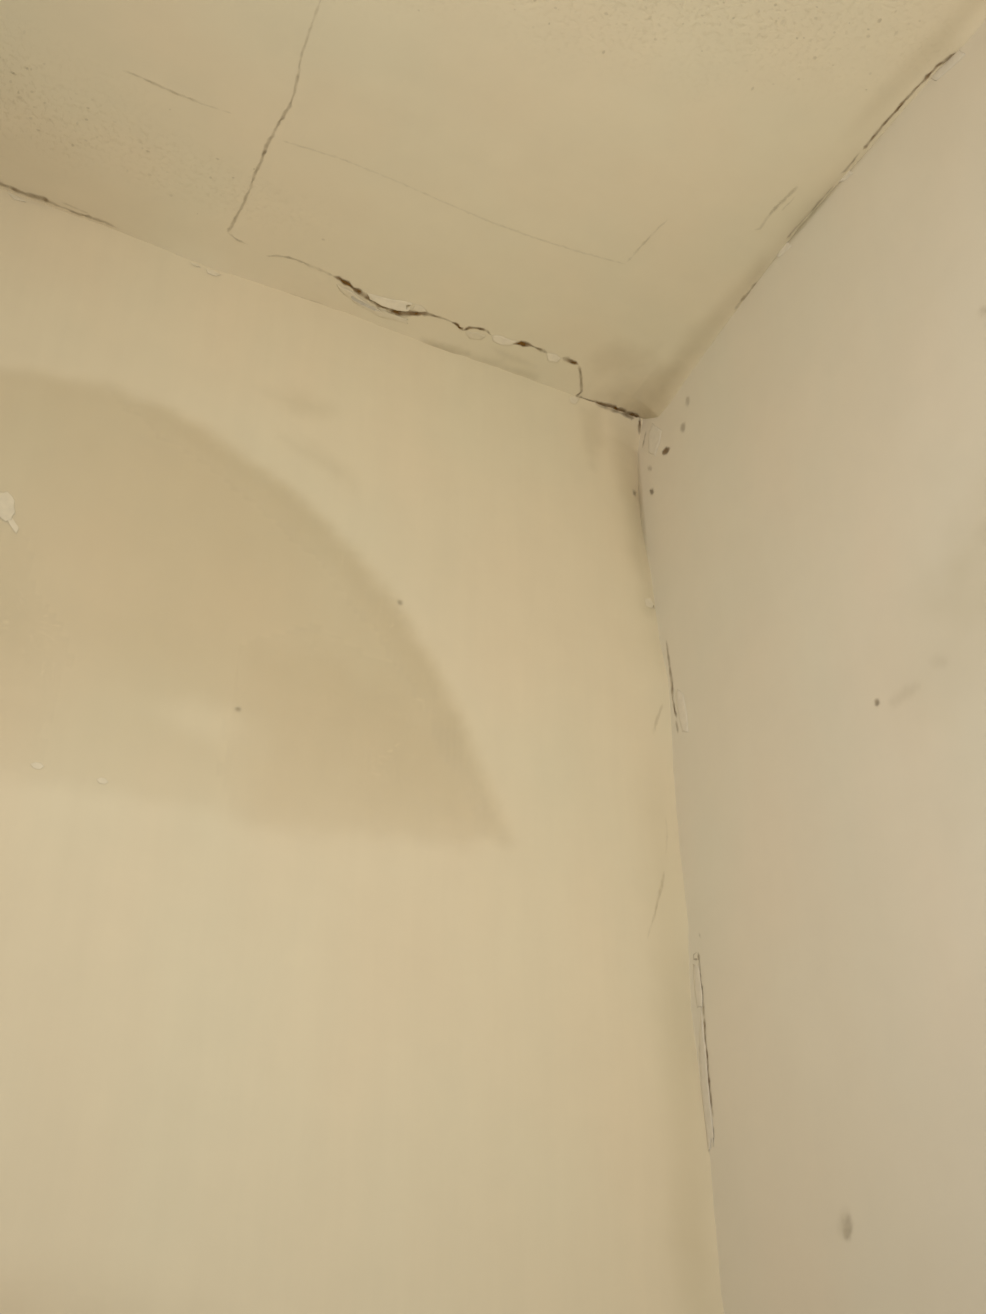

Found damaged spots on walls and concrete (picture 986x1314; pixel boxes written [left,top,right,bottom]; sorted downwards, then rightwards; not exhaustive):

crack [337,277,662,456]